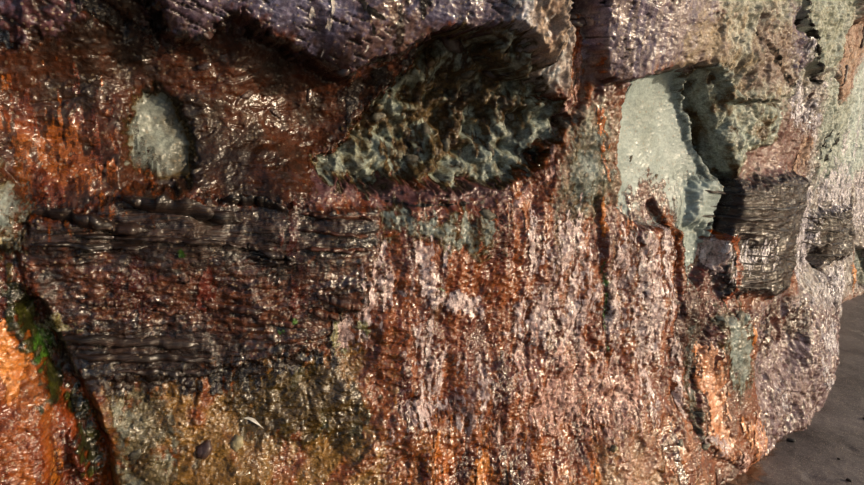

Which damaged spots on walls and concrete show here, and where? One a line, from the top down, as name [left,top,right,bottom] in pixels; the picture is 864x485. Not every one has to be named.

crack [755,0,840,99]
peeling [837,19,864,101]
spalling [0,3,733,284]
corrosion [0,247,114,485]
damp [60,340,339,407]
damp [274,194,317,320]
corrosion [390,347,612,485]
damp [353,192,691,462]
corrosion [619,167,782,485]